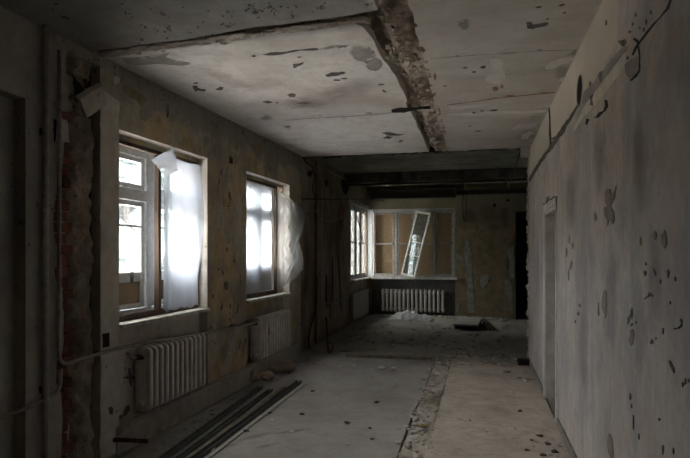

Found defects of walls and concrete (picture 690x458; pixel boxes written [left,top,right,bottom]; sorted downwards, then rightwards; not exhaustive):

spalling [97,0,549,159]
peeling [574,10,652,131]
spalling [53,56,95,458]
peeling [594,186,617,226]